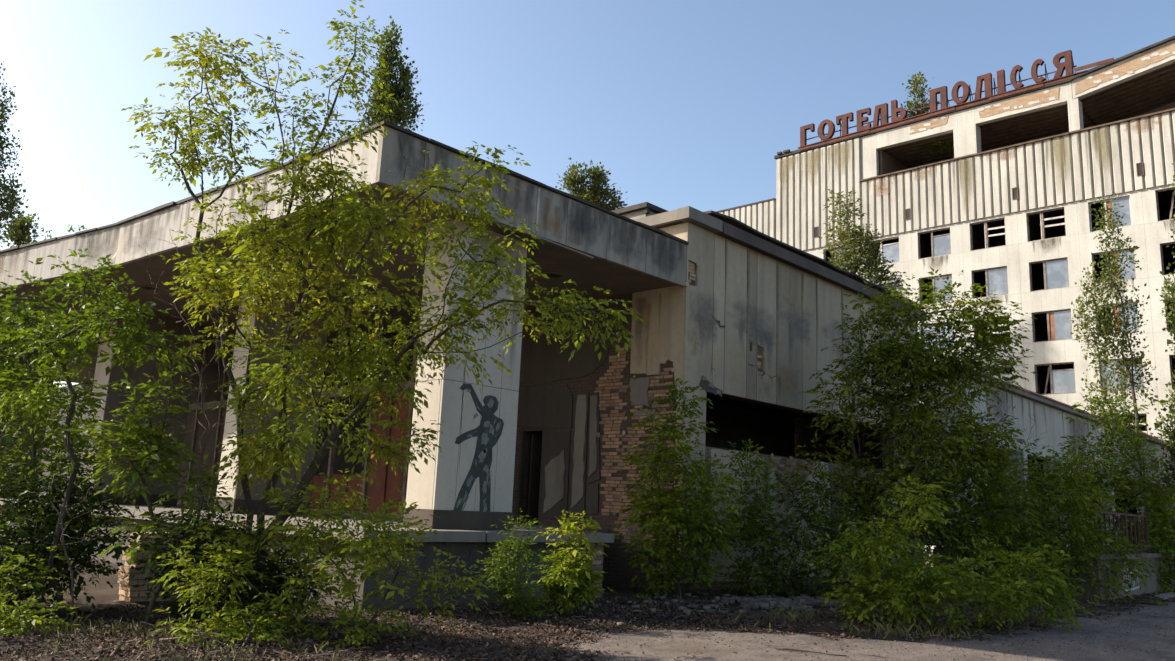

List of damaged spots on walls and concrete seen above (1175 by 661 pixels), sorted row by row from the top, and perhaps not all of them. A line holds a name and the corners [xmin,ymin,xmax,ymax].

peeling [1133,51,1175,61]
peeling [1073,71,1133,84]
spalling [594,333,678,569]